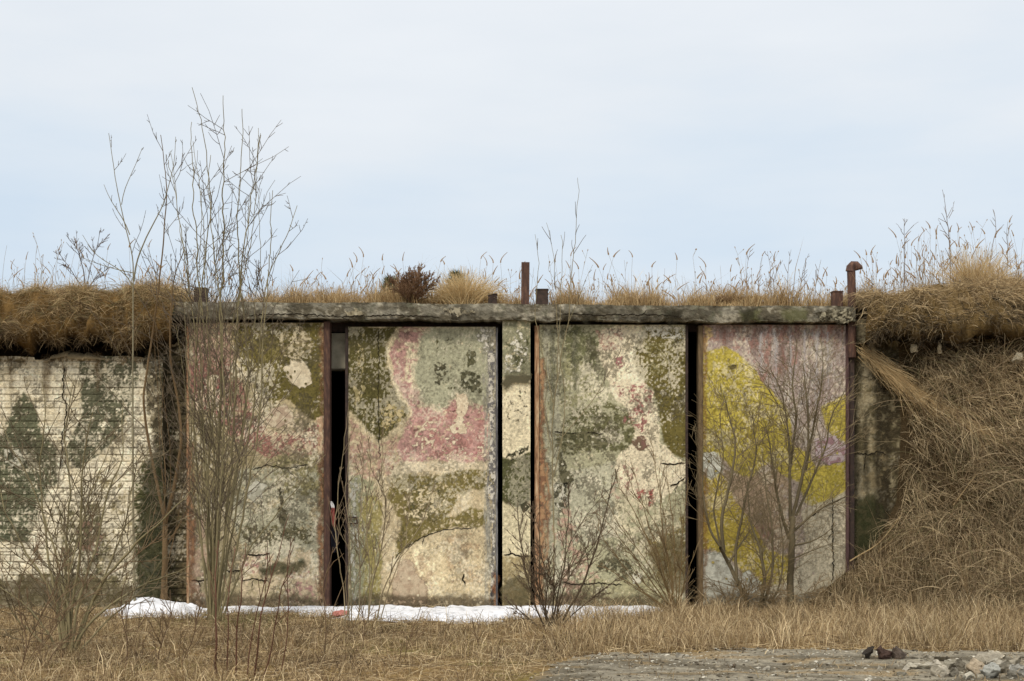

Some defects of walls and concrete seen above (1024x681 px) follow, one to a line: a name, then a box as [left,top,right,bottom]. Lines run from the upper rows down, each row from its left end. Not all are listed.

peeling [278,326,313,388]
peeling [645,325,685,339]
water stain [0,448,163,607]
peeling [243,479,308,544]
peeling [403,489,442,525]
peeling [412,327,529,606]
corrosion [539,358,551,600]
peeling [553,431,608,511]
peeling [631,435,650,451]
water stain [854,353,890,513]
peeling [392,559,428,605]
peeling [597,558,642,583]